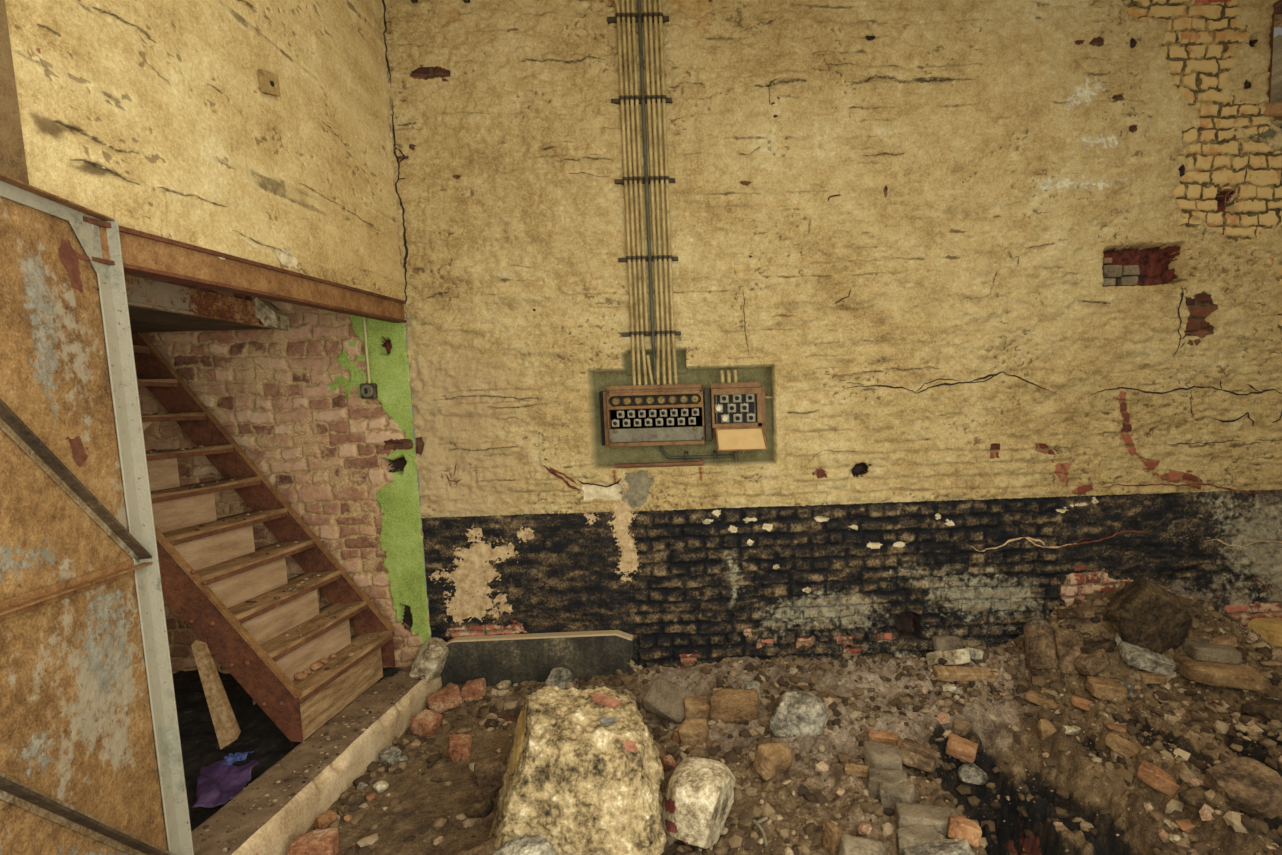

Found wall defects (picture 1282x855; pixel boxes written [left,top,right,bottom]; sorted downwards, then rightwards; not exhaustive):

spalling [1075,36,1104,47]
flaking render [1125,0,1282,243]
spalling [1103,244,1218,346]
crack [827,341,1057,394]
crack [1090,285,1282,445]
flaking render [383,437,424,473]
spalling [1116,391,1203,490]
spalling [402,605,413,631]
peeling [429,525,534,638]